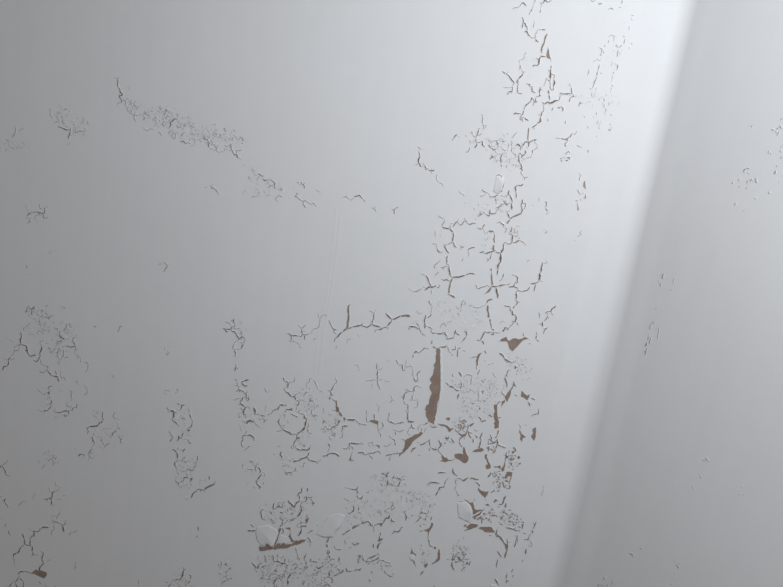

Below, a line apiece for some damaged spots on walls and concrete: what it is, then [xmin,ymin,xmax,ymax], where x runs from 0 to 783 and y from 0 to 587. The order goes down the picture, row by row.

crack [115,77,321,208]
crack [409,0,590,336]
crack [2,305,124,460]
crack [164,387,199,489]
crack [217,313,436,587]
peeling [327,296,540,565]
crack [445,345,533,433]
peeling [17,550,52,580]
crack [0,482,78,587]
peeling [247,487,320,553]
crack [450,539,472,571]
crack [474,507,536,587]